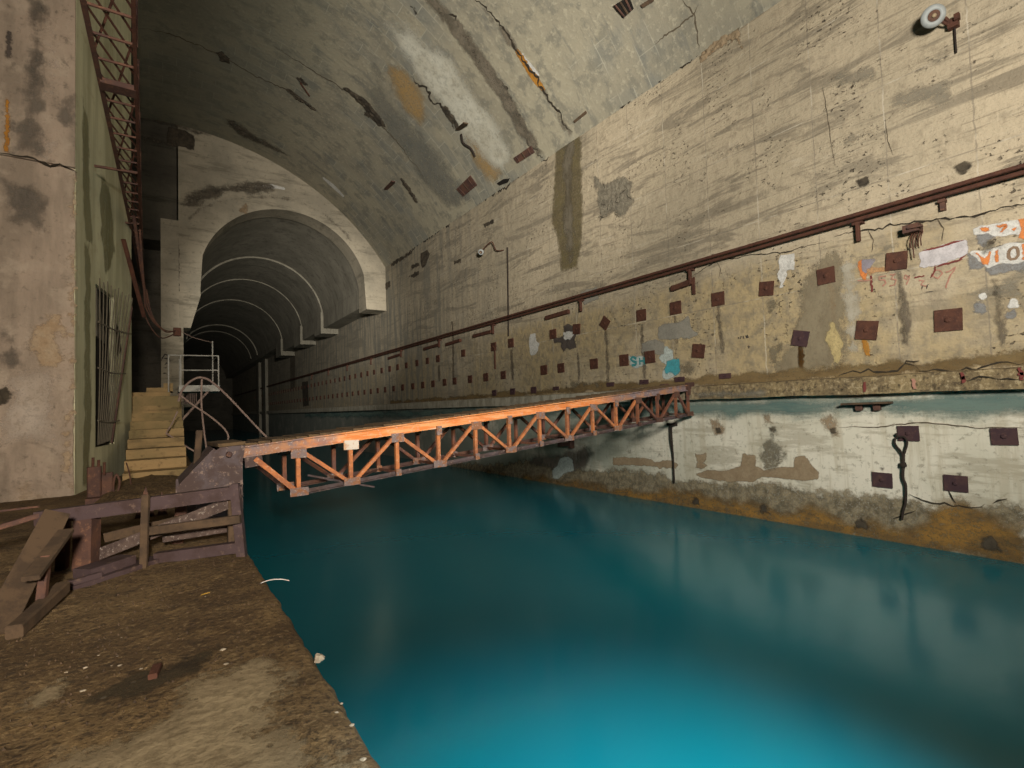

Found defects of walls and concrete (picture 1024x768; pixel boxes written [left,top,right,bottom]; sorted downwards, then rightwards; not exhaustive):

crack [476,1,571,133]
spalling [343,87,386,127]
crack [3,153,77,173]
leakage [7,185,45,226]
leakage [552,138,582,270]
spalling [594,177,633,222]
crack [687,204,1024,280]